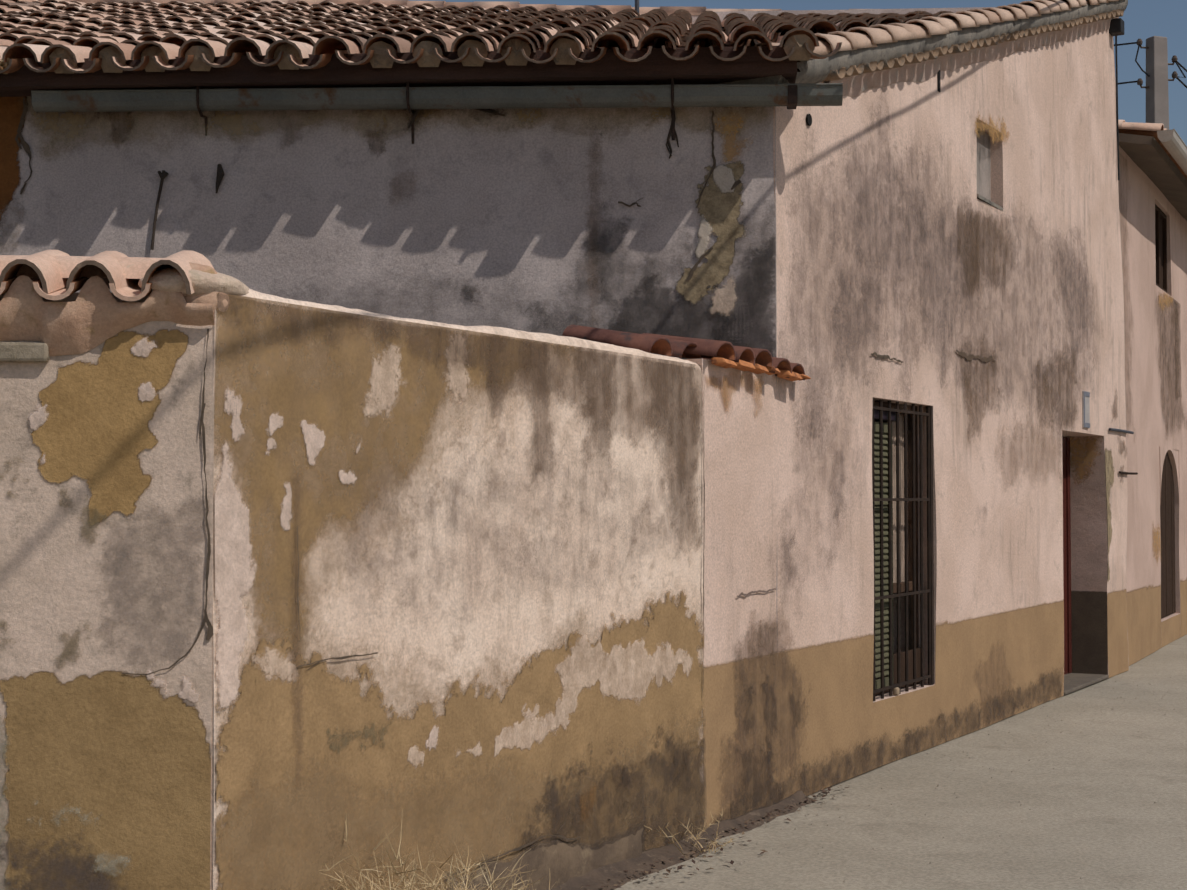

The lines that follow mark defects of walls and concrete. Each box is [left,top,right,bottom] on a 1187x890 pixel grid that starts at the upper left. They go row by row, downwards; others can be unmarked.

peeling [28,329,189,537]
crack [122,329,214,675]
water stain [214,292,701,651]
water stain [609,246,776,355]
spalling [676,115,746,316]
water stain [961,350,998,438]
peeling [0,443,706,890]
water stain [440,625,1062,866]